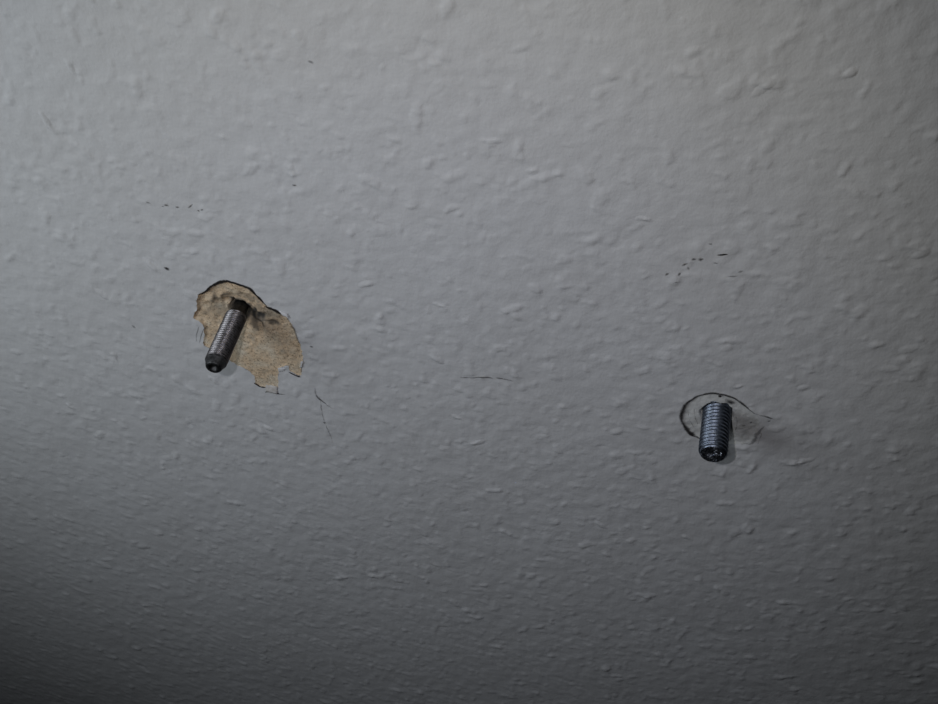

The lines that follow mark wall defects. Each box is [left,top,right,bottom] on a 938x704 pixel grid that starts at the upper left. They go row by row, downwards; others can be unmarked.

flaking render [193,280,303,395]